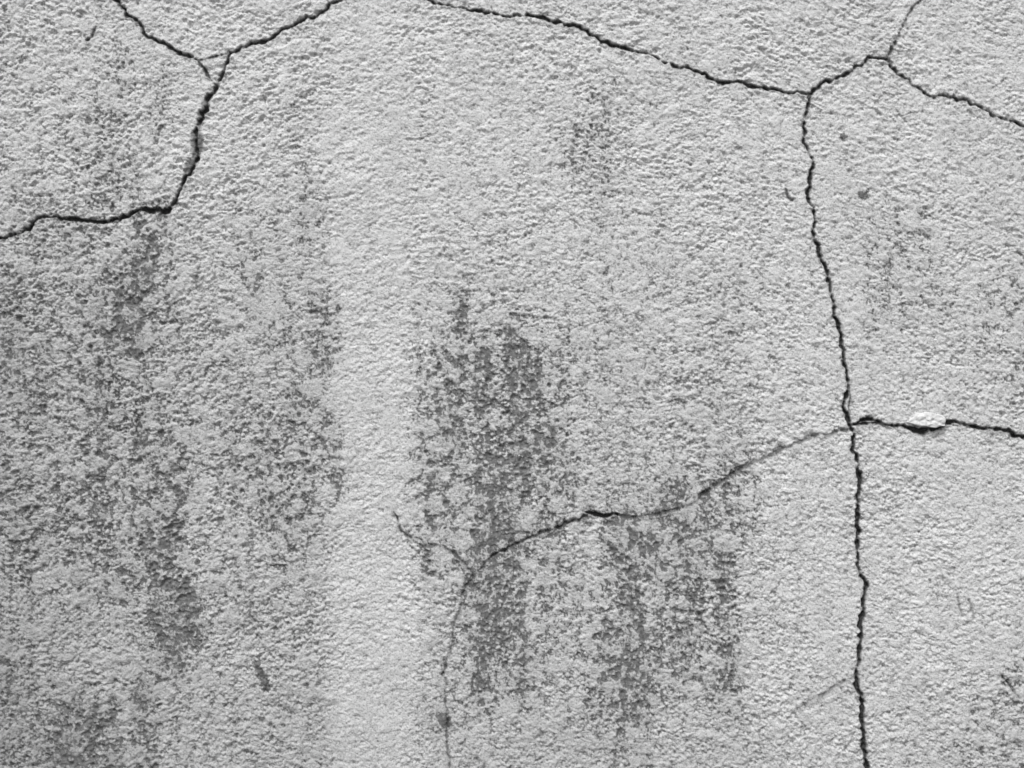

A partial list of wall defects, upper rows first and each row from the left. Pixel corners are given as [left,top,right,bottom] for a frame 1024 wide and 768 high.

crack [0,0,342,239]
leakage [241,252,261,296]
leakage [2,284,48,359]
leakage [307,291,341,375]
leakage [10,375,47,436]
leakage [31,43,208,768]
crack [428,0,1024,768]
leakage [222,383,349,573]
leakage [0,508,39,587]
leakage [406,290,761,768]
leakage [0,658,32,706]
leakage [252,661,270,692]